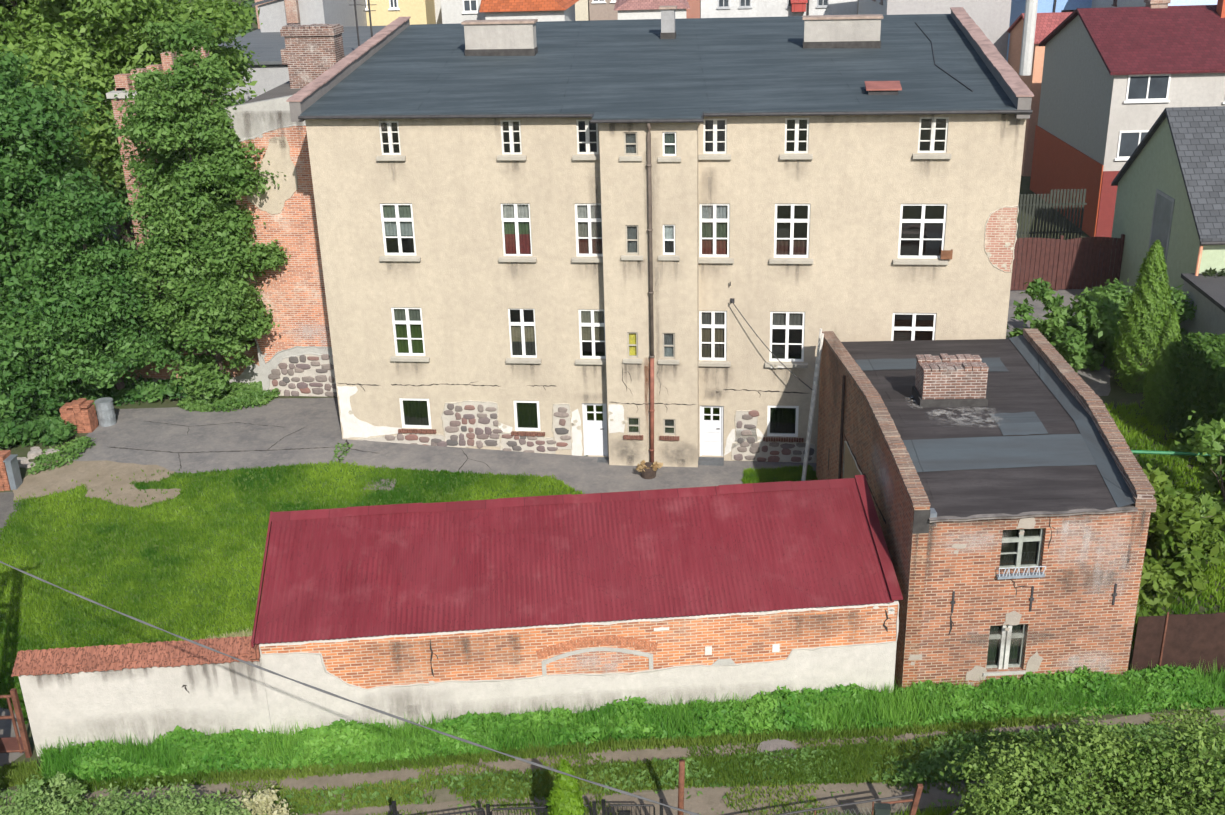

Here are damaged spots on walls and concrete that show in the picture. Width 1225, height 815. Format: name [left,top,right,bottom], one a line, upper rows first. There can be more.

flaking render [984,205,1019,273]
flaking render [229,124,583,456]
crack [338,382,555,391]
crack [723,389,807,398]
crack [430,641,438,677]
flaking render [259,603,899,690]